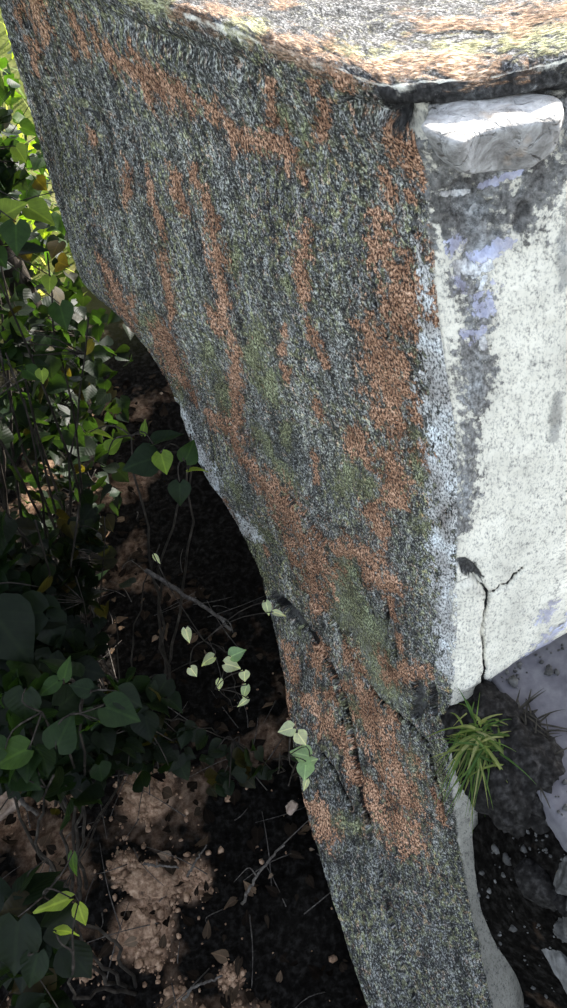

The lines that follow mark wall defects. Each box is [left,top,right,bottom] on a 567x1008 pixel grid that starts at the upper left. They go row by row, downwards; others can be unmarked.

leakage [403,62,567,537]
crack [480,567,523,680]